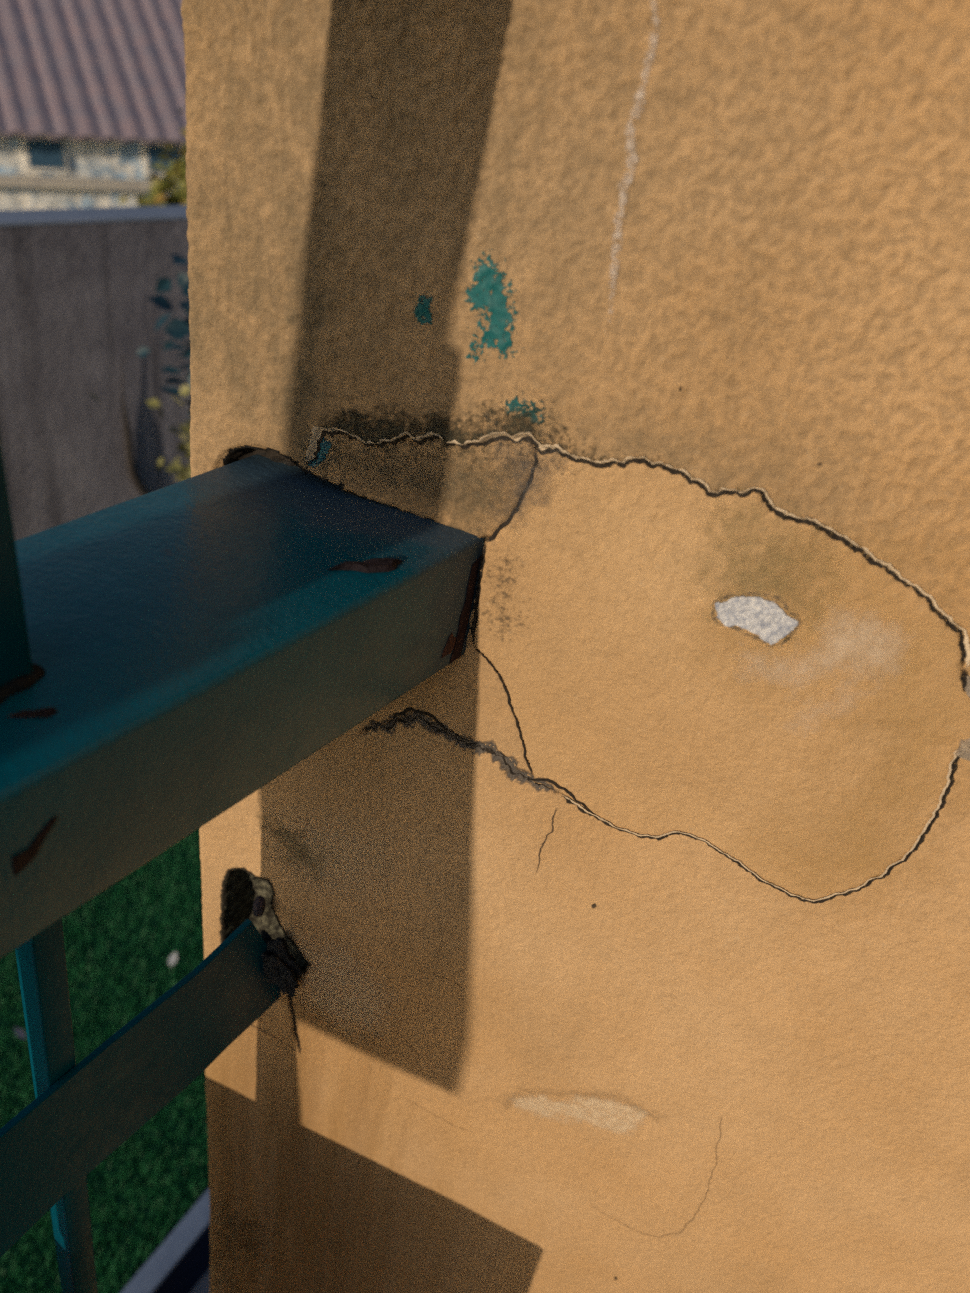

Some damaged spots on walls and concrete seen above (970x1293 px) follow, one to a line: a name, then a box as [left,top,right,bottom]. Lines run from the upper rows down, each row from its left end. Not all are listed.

water stain [323,408,574,453]
rust [442,556,481,663]
crack [306,427,970,904]
peeling [712,596,798,645]
spalling [219,868,310,974]
peeling [512,1095,647,1132]